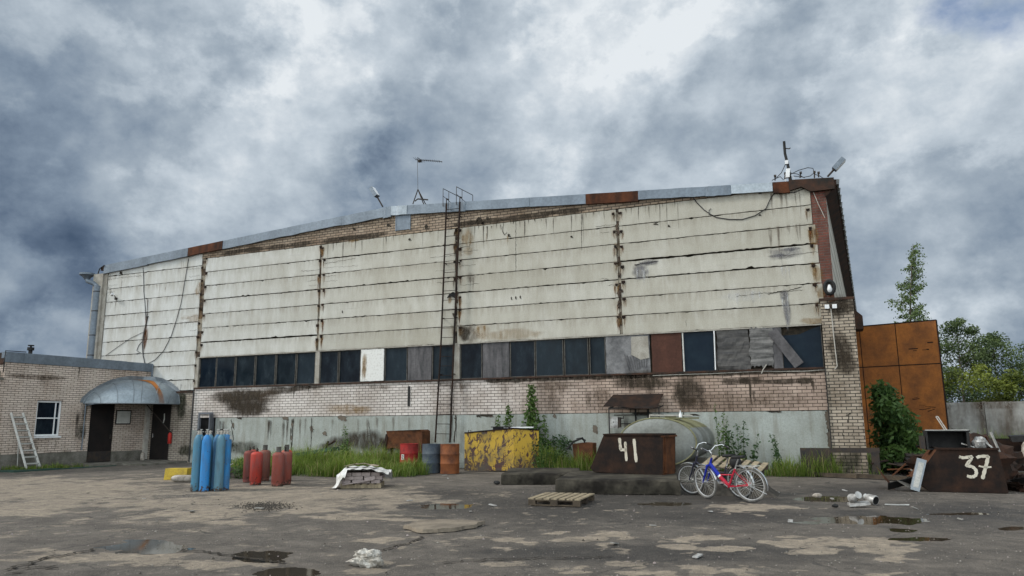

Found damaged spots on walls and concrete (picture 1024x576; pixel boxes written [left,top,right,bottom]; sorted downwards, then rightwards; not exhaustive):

water stain [828,336,856,373]
water stain [486,369,822,404]
water stain [217,385,322,432]